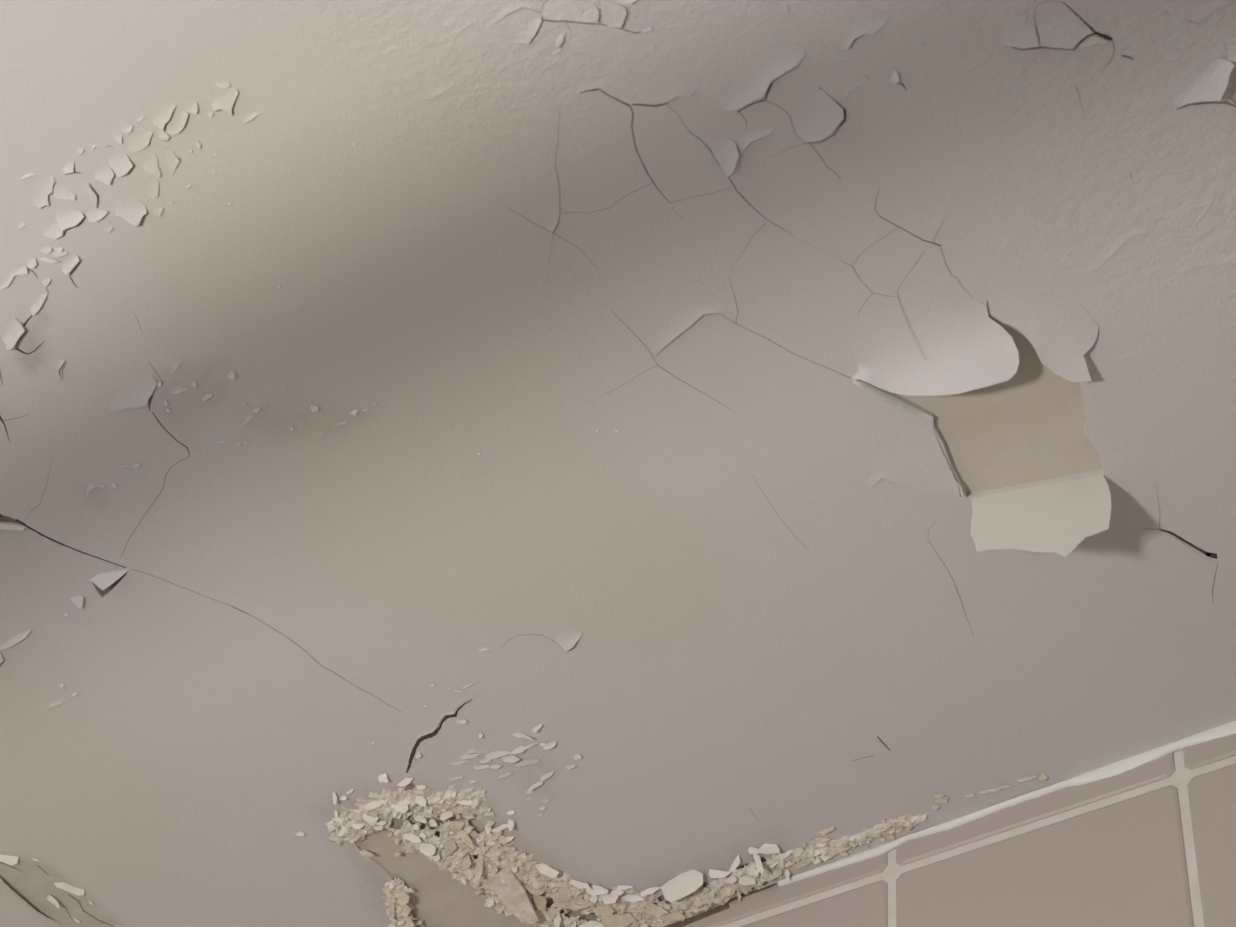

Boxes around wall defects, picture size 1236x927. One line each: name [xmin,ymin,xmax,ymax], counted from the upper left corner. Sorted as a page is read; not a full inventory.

peeling [0,81,262,355]
peeling [492,0,652,55]
crack [507,65,730,286]
peeling [709,44,907,180]
crack [1001,0,1154,69]
peeling [1173,39,1236,110]
crack [598,278,854,413]
crack [103,362,190,569]
peeling [845,281,1111,557]
crack [1154,491,1218,597]
crack [406,682,474,773]
spalling [325,723,948,927]